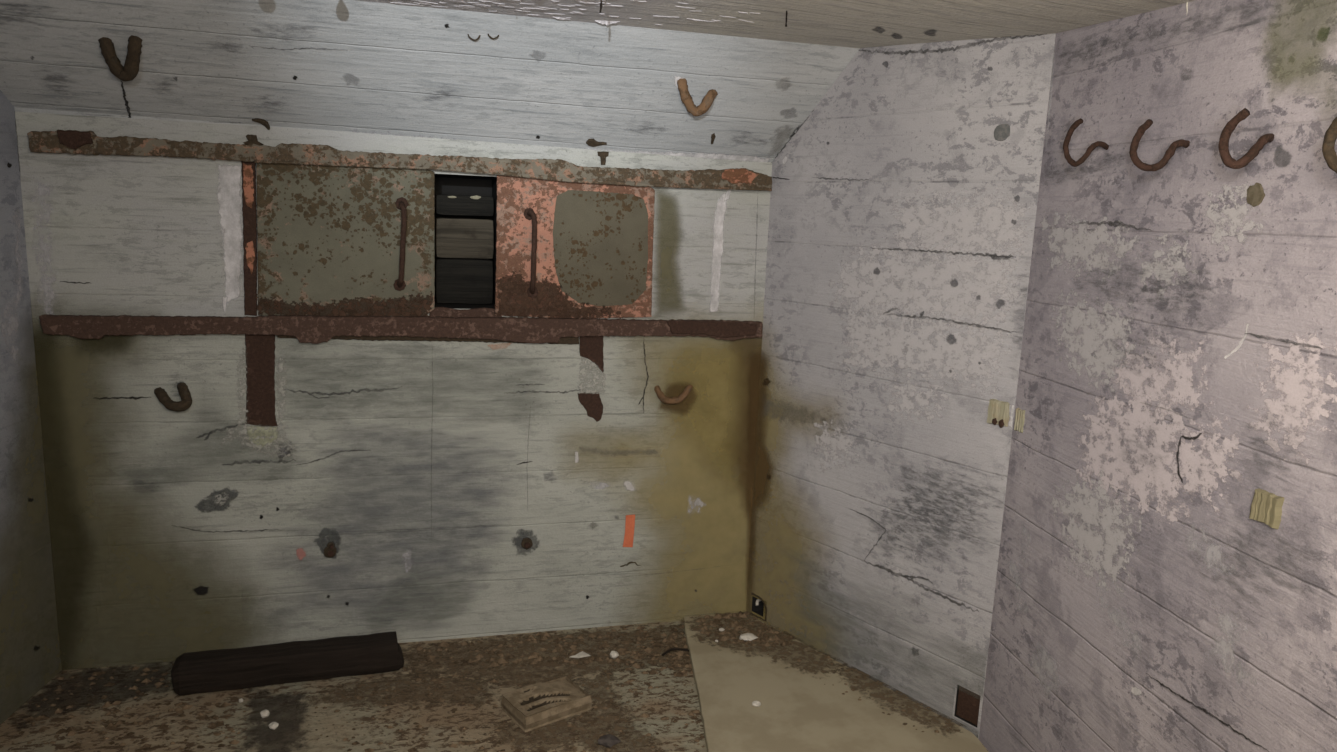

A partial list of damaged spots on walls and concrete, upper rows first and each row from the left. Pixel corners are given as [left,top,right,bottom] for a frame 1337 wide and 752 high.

peeling [390,0,760,25]
spalling [1317,27,1330,41]
corrosion [494,270,624,319]
spalling [578,358,606,394]
crack [1176,433,1202,483]
damp [615,338,831,655]
crack [850,509,978,611]